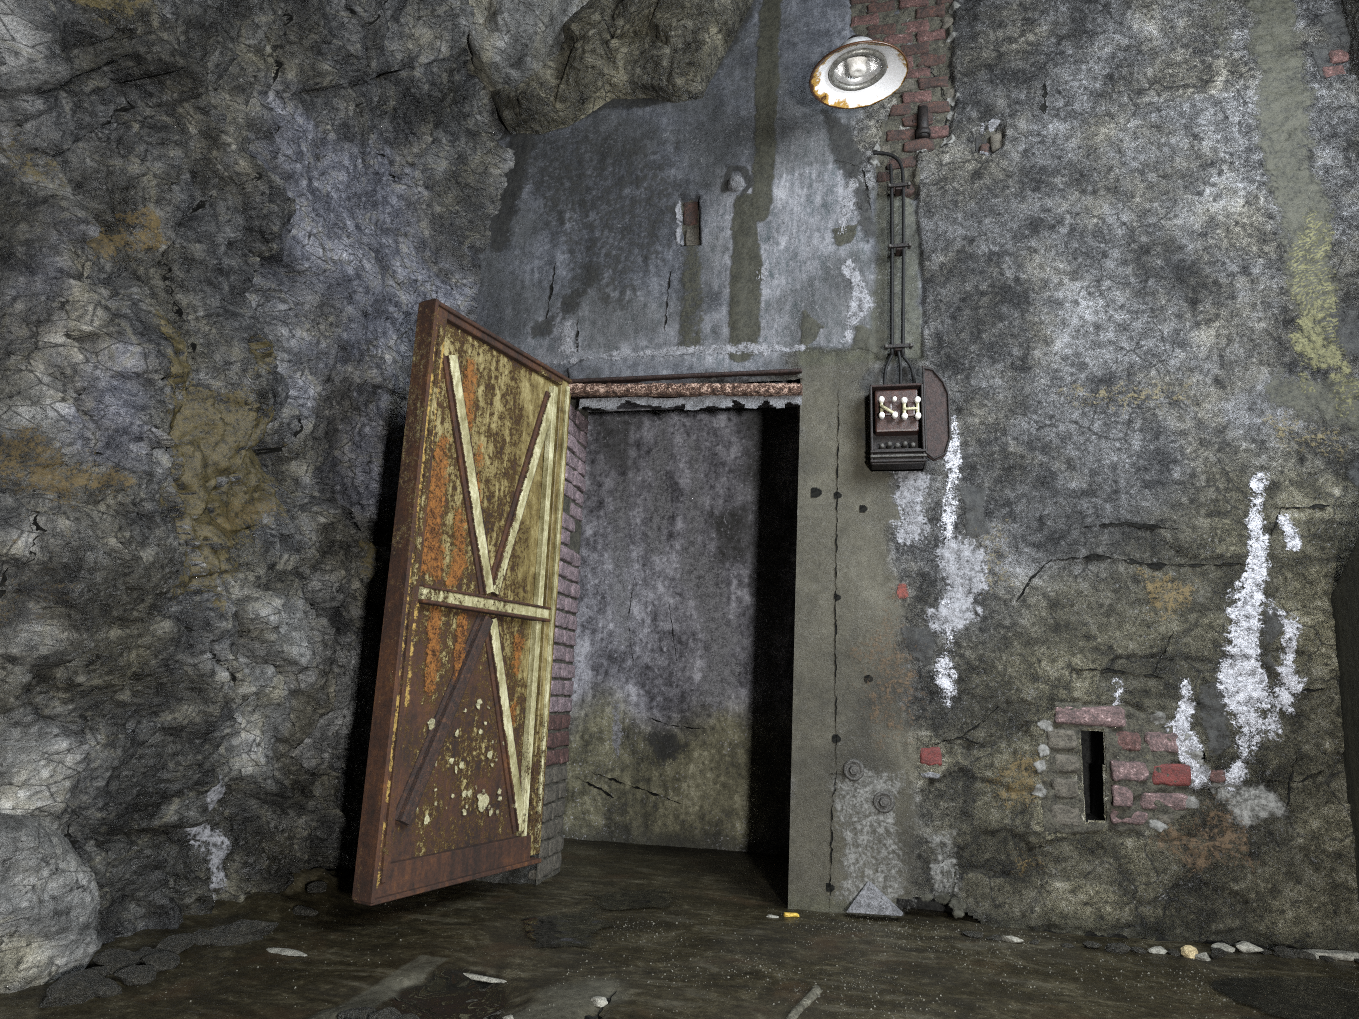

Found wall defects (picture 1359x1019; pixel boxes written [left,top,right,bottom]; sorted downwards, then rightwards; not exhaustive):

spalling [850,0,960,200]
spalling [975,119,1003,156]
rust [424,606,467,695]
rust [421,358,484,589]
damp [890,416,1008,705]
damp [1164,472,1306,791]
spalling [1032,702,1226,836]